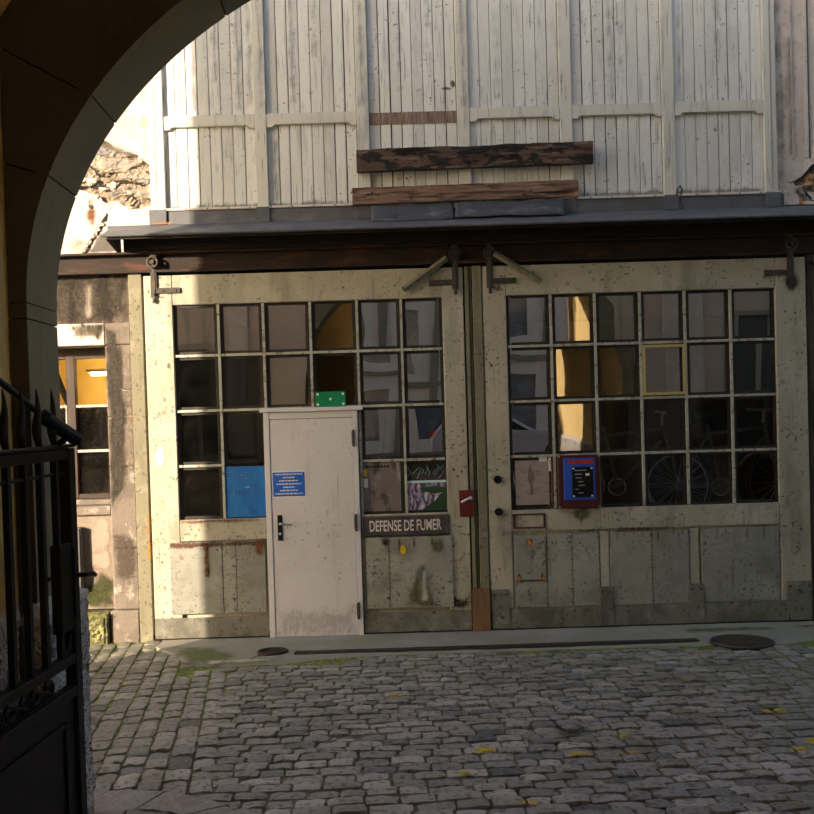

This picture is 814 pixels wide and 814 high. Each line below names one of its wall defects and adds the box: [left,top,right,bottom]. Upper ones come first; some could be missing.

spalling [79,142,151,210]
spalling [793,169,814,201]
leakage [56,275,133,499]
corrosion [170,540,264,555]
crack [138,806,177,814]